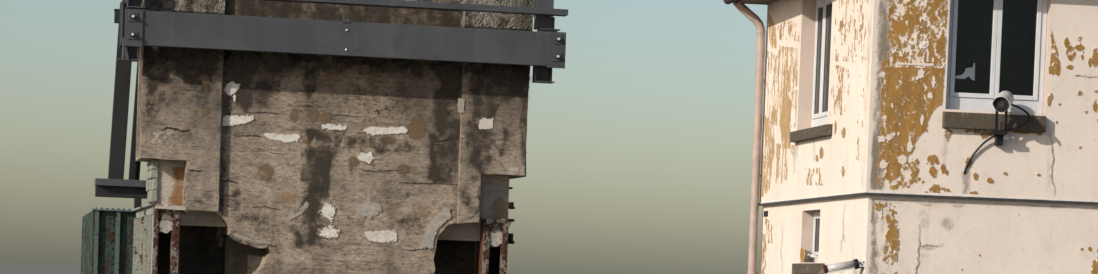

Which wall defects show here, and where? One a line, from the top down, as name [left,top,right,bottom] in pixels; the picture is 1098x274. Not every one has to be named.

damp [135,46,530,248]
peeling [761,14,799,197]
peeling [830,0,869,161]
peeling [877,0,951,193]
peeling [944,128,992,141]
peeling [1048,31,1098,76]
rust [171,167,183,205]
peeling [874,202,899,274]
peeling [1080,247,1098,274]